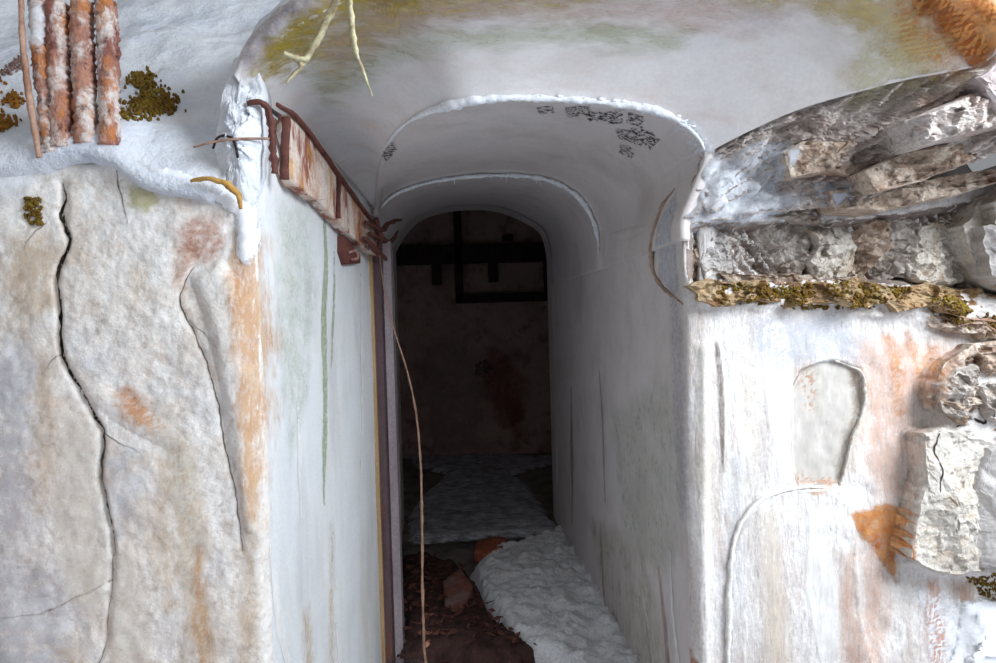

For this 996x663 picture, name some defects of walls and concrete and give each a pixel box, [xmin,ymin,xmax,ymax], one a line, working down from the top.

crack [116,170,128,223]
crack [2,185,141,663]
crack [179,267,243,551]
corrosion [232,252,273,515]